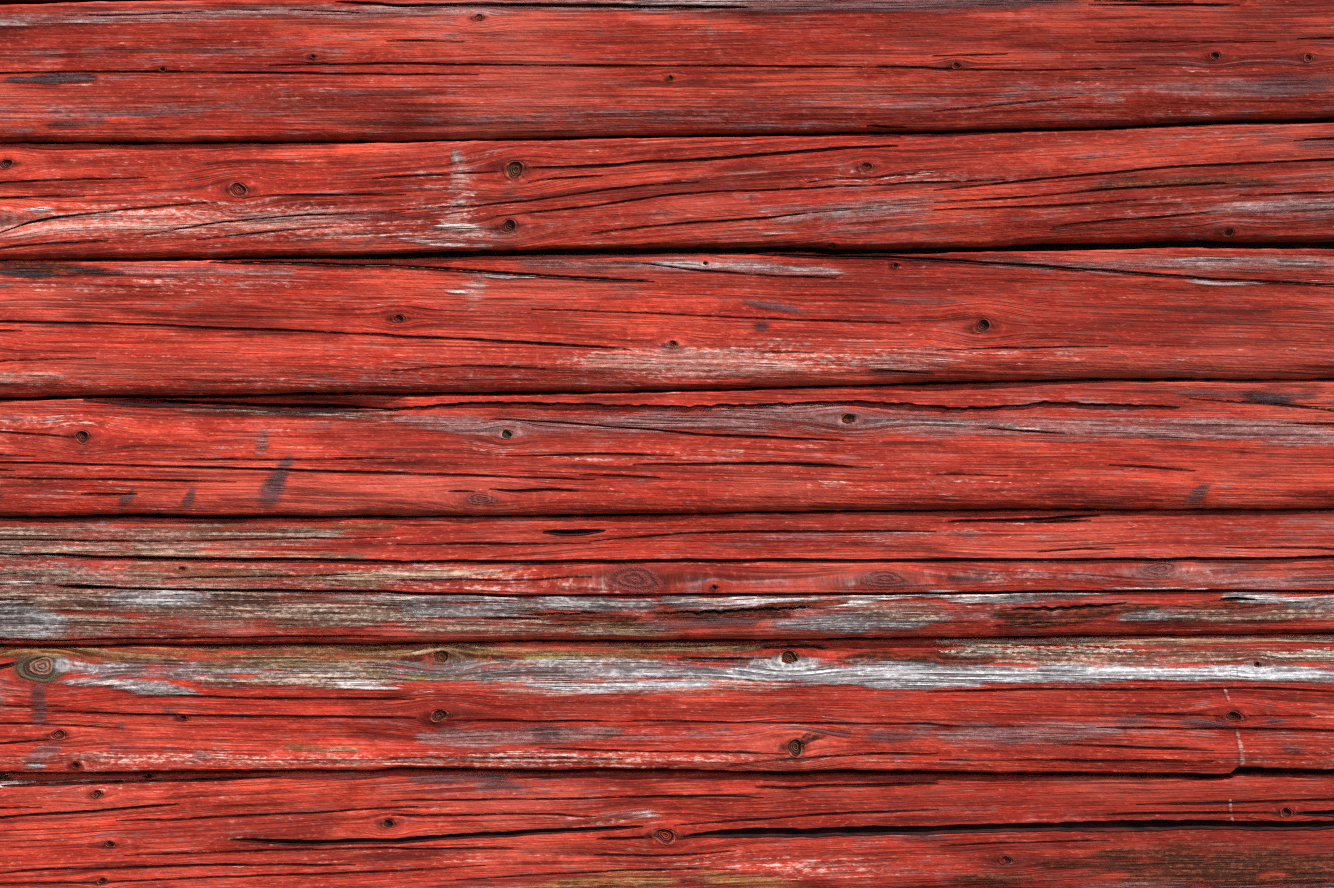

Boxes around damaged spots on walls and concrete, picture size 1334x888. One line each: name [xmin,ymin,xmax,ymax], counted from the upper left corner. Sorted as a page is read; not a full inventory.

crack [0,125,1334,352]
crack [0,321,629,369]
crack [0,369,1334,494]
peeling [0,526,1334,694]
crack [0,687,1334,884]